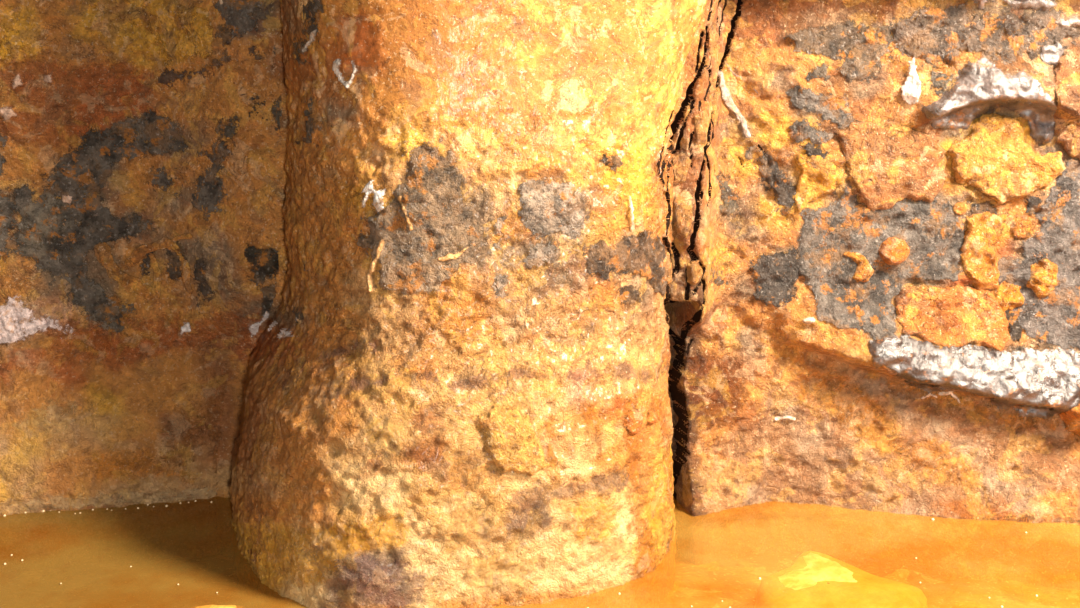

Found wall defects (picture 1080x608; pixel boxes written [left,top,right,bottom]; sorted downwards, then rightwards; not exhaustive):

rust [0,55,152,147]
rust [694,79,719,145]
rust [673,152,693,238]
rust [794,46,1080,351]
rust [0,310,260,372]
rust [664,252,673,284]
rust [664,305,677,327]
rust [686,260,702,286]
crack [657,0,743,551]
rust [688,354,742,428]
rust [506,399,675,600]
rust [264,514,425,608]